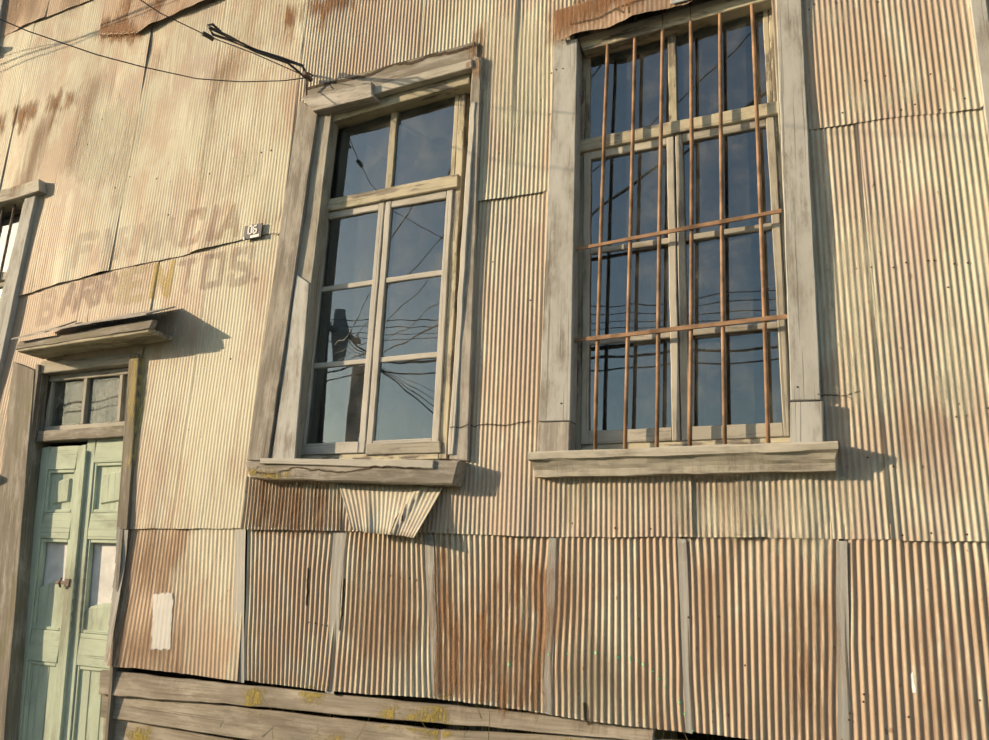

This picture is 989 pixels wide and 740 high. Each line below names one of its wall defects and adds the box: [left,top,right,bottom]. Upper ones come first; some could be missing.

rust [99,0,141,42]
rust [285,8,301,38]
rust [553,0,633,44]
rust [0,88,73,135]
crack [450,420,530,428]
rust [434,550,459,698]
rust [479,557,549,716]